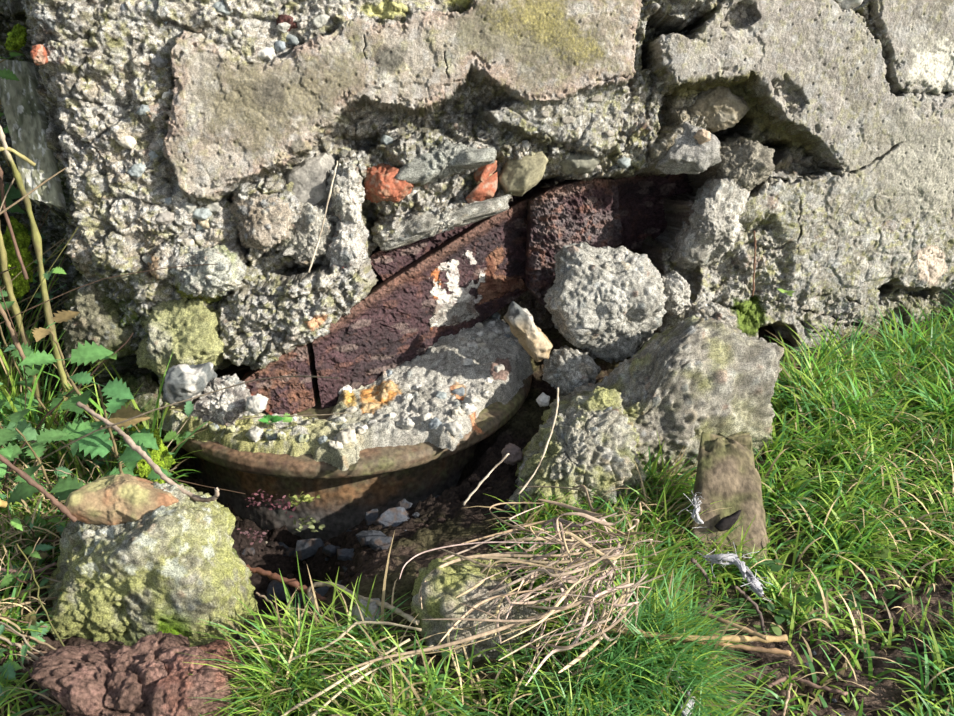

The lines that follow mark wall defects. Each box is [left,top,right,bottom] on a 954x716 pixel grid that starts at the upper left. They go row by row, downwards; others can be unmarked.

spalling [833,0,871,18]
spalling [42,0,834,317]
rust [431,262,443,300]
rust [477,247,525,305]
spalling [490,290,555,330]
rust [490,358,511,381]
rust [342,381,401,414]
rust [450,382,466,401]